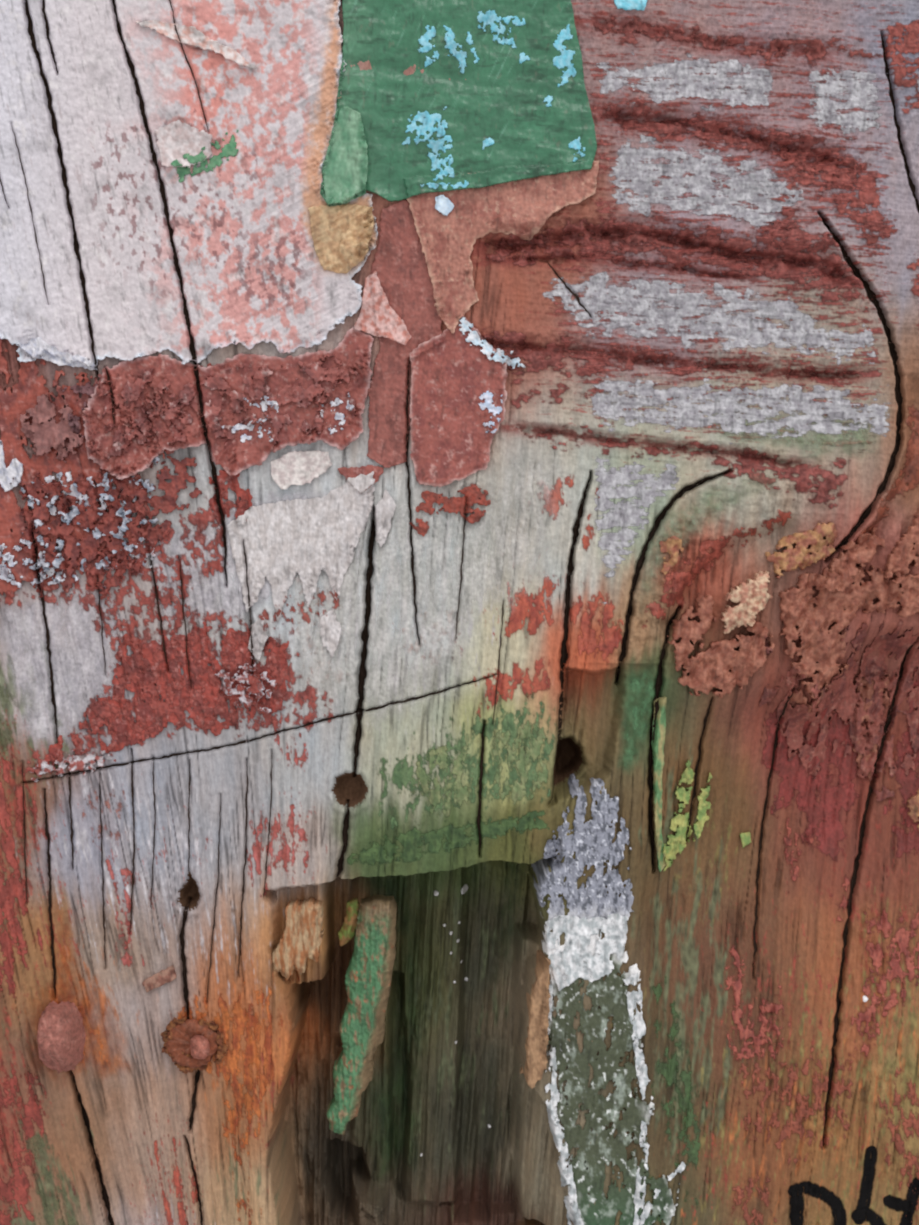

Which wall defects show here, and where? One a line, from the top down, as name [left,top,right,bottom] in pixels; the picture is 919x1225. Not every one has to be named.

peeling [0,0,600,605]
crack [405,359,420,645]
crack [821,218,903,561]
crack [72,1072,114,1225]
peeling [30,622,289,782]
crack [185,1070,203,1225]
rust [177,982,283,1165]
crack [22,501,504,1019]
peeling [520,774,686,1225]
peeling [651,697,712,872]
crack [823,636,919,1145]